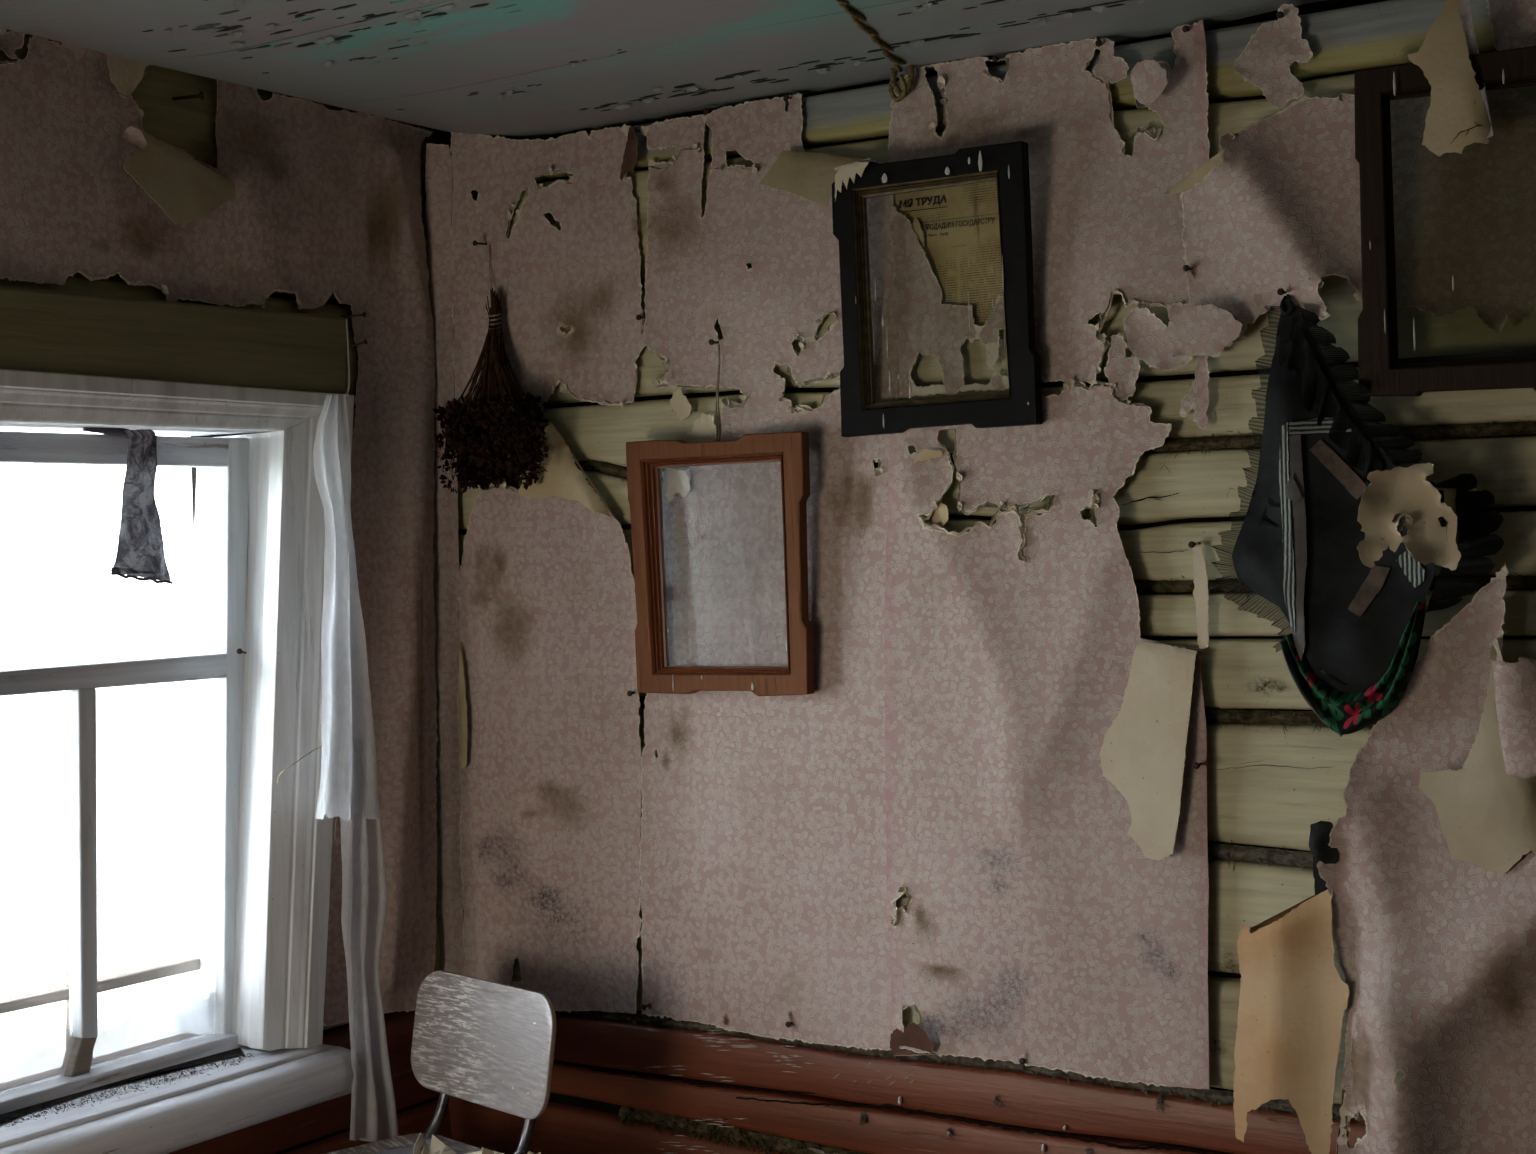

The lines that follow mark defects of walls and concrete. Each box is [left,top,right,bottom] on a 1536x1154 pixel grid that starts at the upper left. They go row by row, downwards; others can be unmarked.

peeling [143,0,522,74]
peeling [580,0,1145,112]